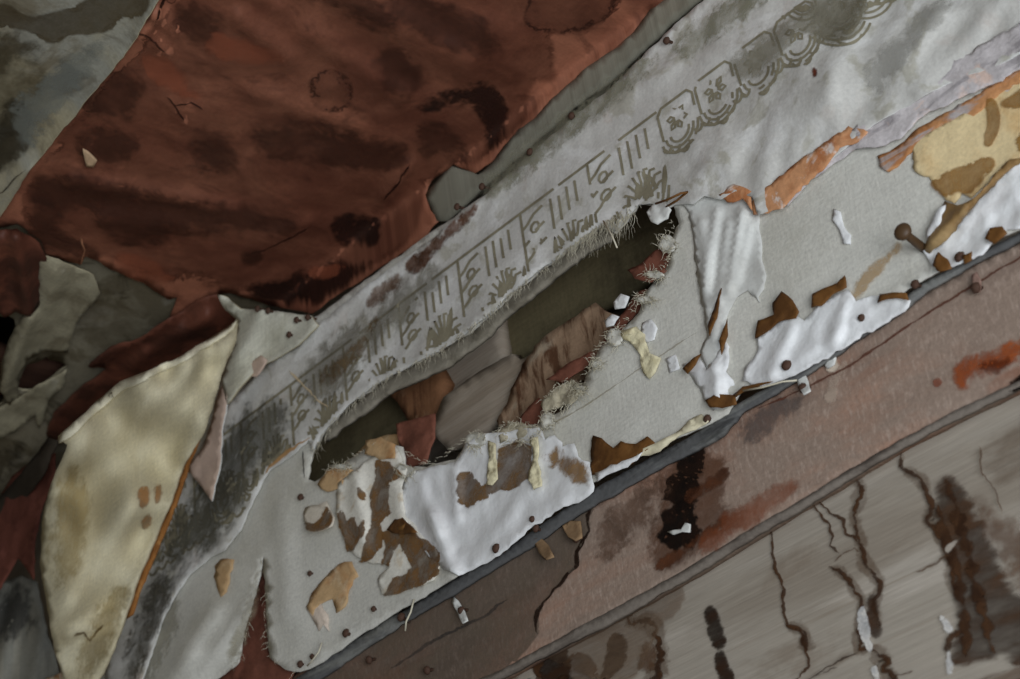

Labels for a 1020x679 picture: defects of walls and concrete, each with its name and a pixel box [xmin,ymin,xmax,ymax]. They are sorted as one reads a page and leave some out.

water stain [0,81,40,169]
corrosion [406,205,477,274]
peeling [303,23,1020,631]
corrosion [954,341,1020,389]
water stain [337,460,440,596]
water stain [374,508,593,679]
water stain [456,439,532,508]
water stain [550,447,587,483]
water stain [603,453,726,568]
water stain [899,449,1020,679]
water stain [532,614,666,679]
crack [810,653,856,679]